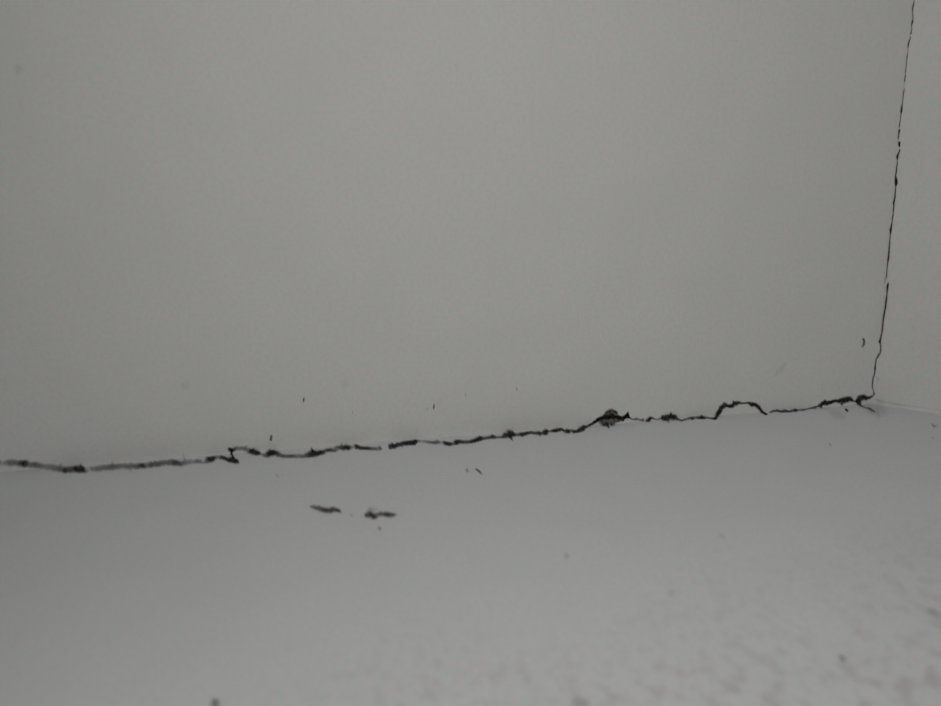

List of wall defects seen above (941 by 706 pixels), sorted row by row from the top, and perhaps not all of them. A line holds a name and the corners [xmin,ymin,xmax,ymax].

crack [631,2,914,422]
crack [9,418,599,473]